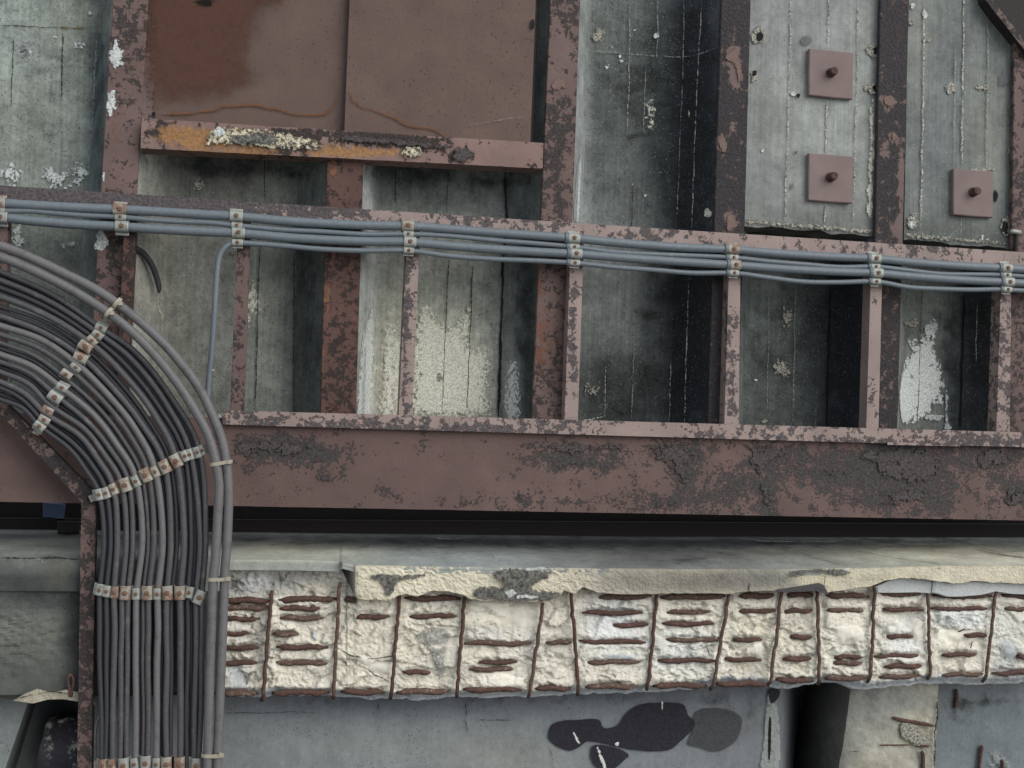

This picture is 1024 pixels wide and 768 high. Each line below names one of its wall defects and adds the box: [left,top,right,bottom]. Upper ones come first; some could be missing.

rust [146,0,536,142]
damp [0,161,23,186]
damp [41,161,89,189]
damp [574,155,583,223]
damp [899,319,952,430]
peeling [861,447,941,484]
spalling [225,569,1024,768]
damp [548,701,742,768]